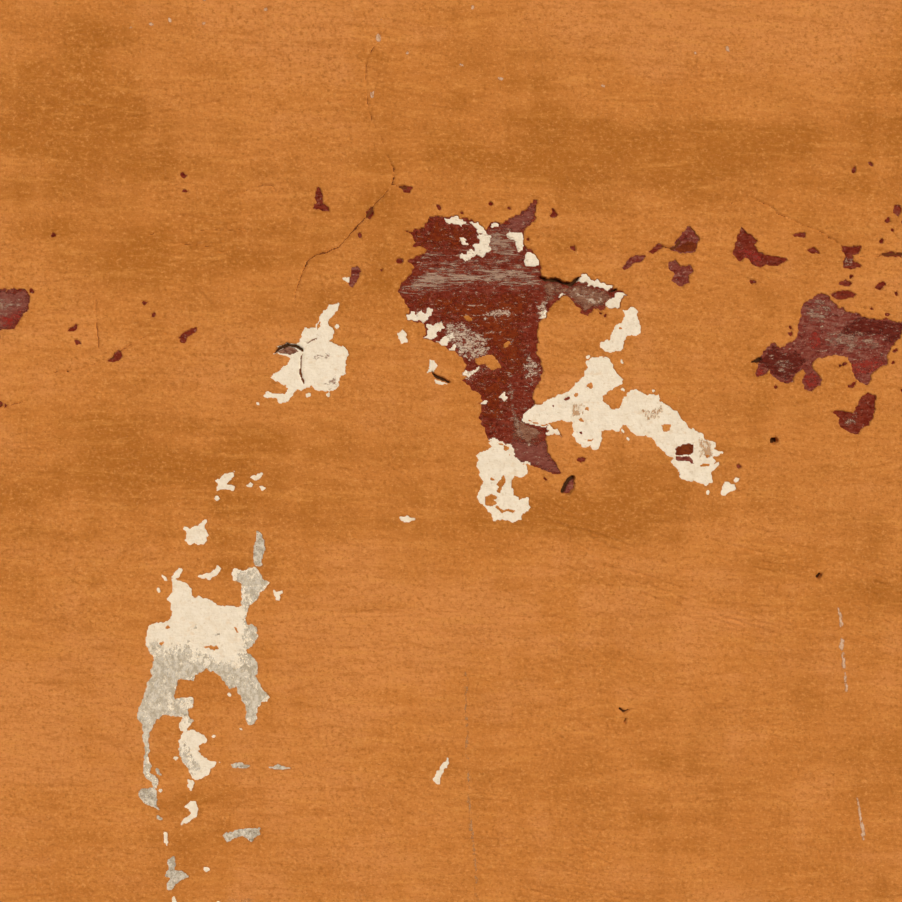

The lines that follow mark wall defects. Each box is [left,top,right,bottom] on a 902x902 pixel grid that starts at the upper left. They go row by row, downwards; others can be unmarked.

peeling [0,288,34,330]
peeling [256,303,349,405]
crack [296,164,413,291]
peeling [398,200,739,523]
peeling [733,227,787,268]
peeling [755,293,902,434]
peeling [842,246,861,270]
peeling [183,519,209,545]
peeling [137,531,283,825]
peeling [165,856,188,902]